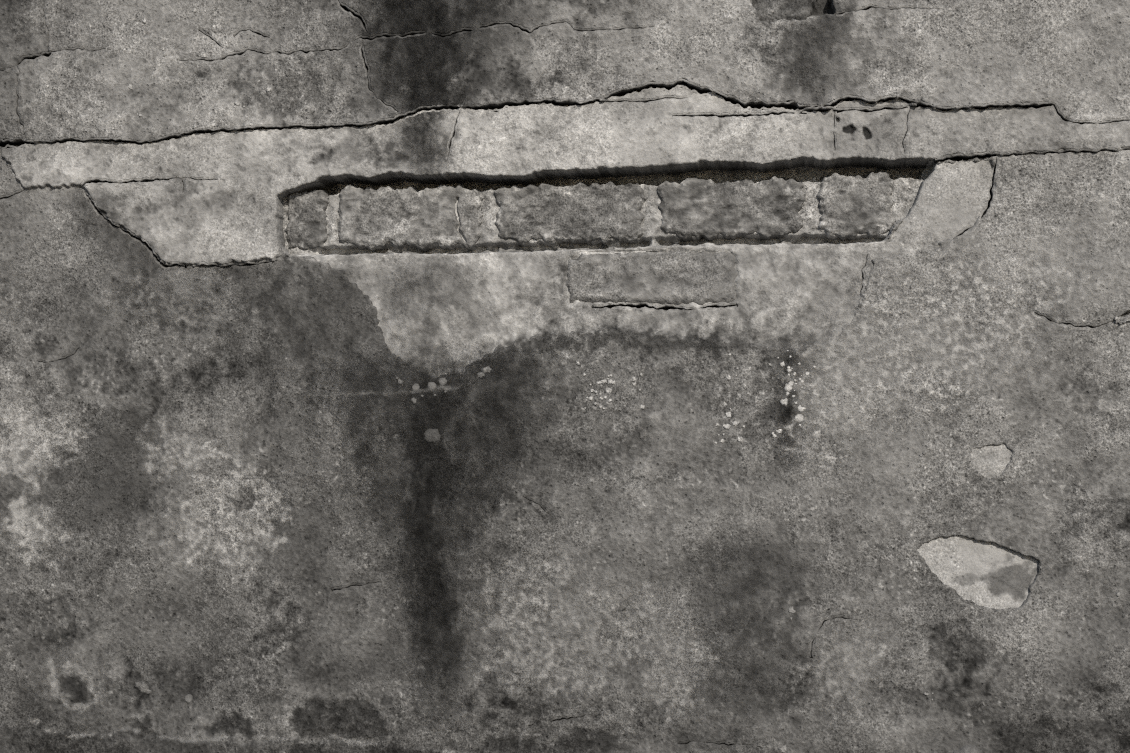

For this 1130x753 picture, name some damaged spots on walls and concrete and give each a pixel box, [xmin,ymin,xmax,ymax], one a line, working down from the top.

water stain [372,0,482,150]
crack [0,3,1130,239]
crack [81,176,277,269]
flaking render [1,85,1130,378]
crack [1034,311,1121,330]
spalling [917,535,1038,609]